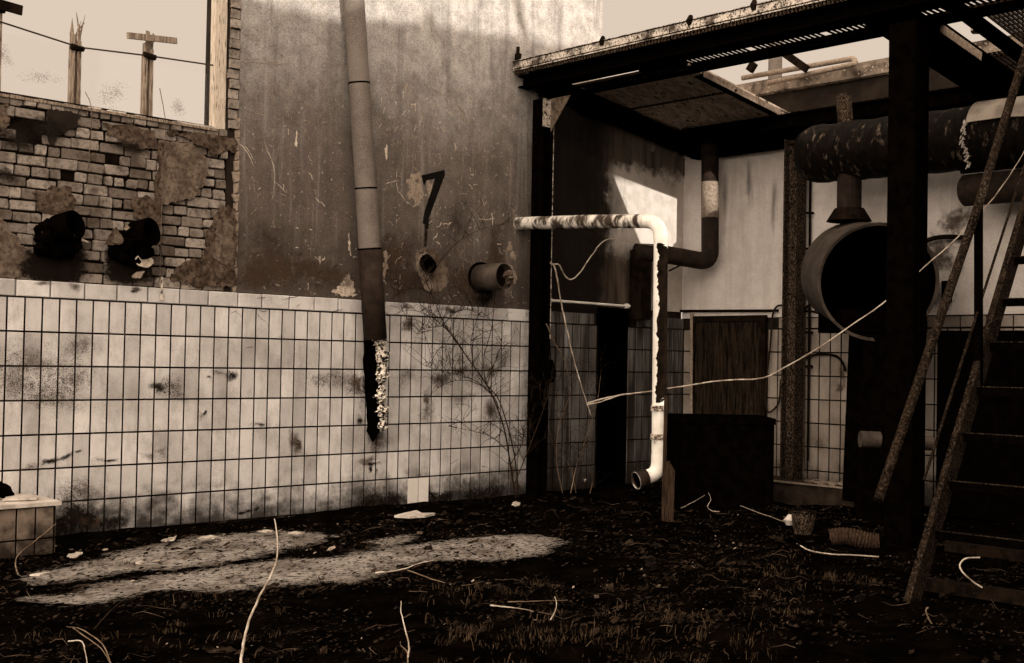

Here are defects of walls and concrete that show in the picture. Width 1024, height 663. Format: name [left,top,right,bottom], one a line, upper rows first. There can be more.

spalling [231,111,310,231]
peeling [379,64,514,291]
peeling [332,234,357,297]
peeling [497,241,517,298]
water stain [1,337,95,407]
water stain [306,373,362,394]